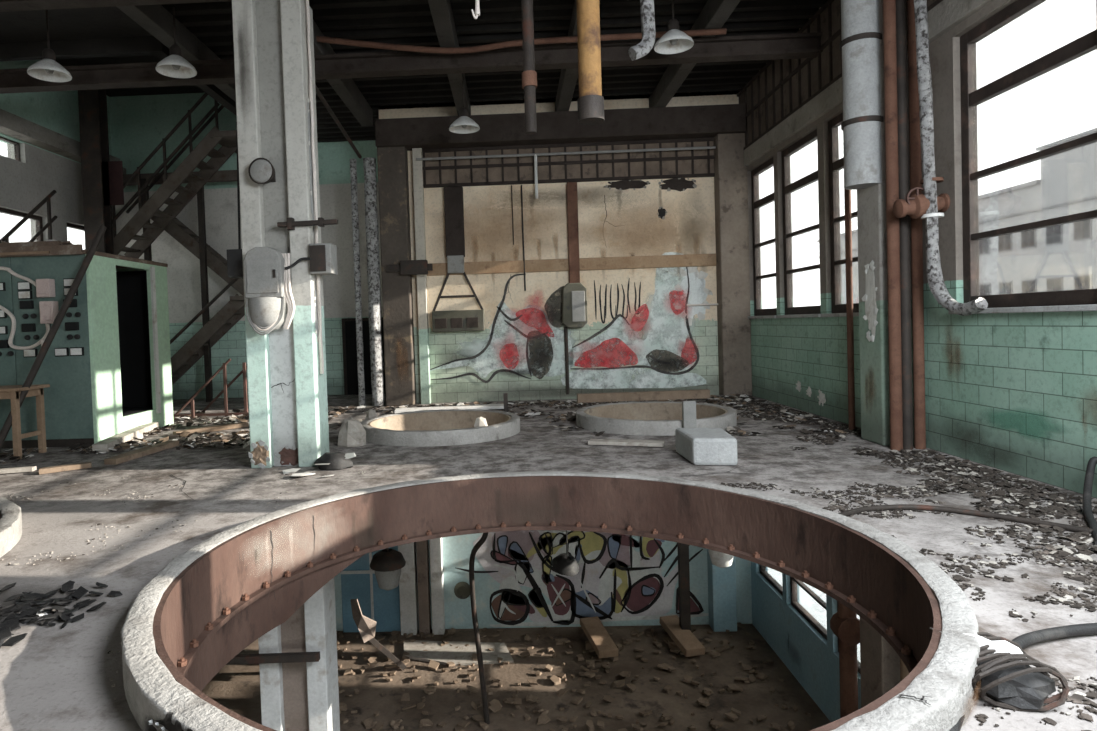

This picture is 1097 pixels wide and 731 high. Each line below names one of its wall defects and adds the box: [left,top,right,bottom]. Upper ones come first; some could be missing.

peeling [975,704,1016,727]